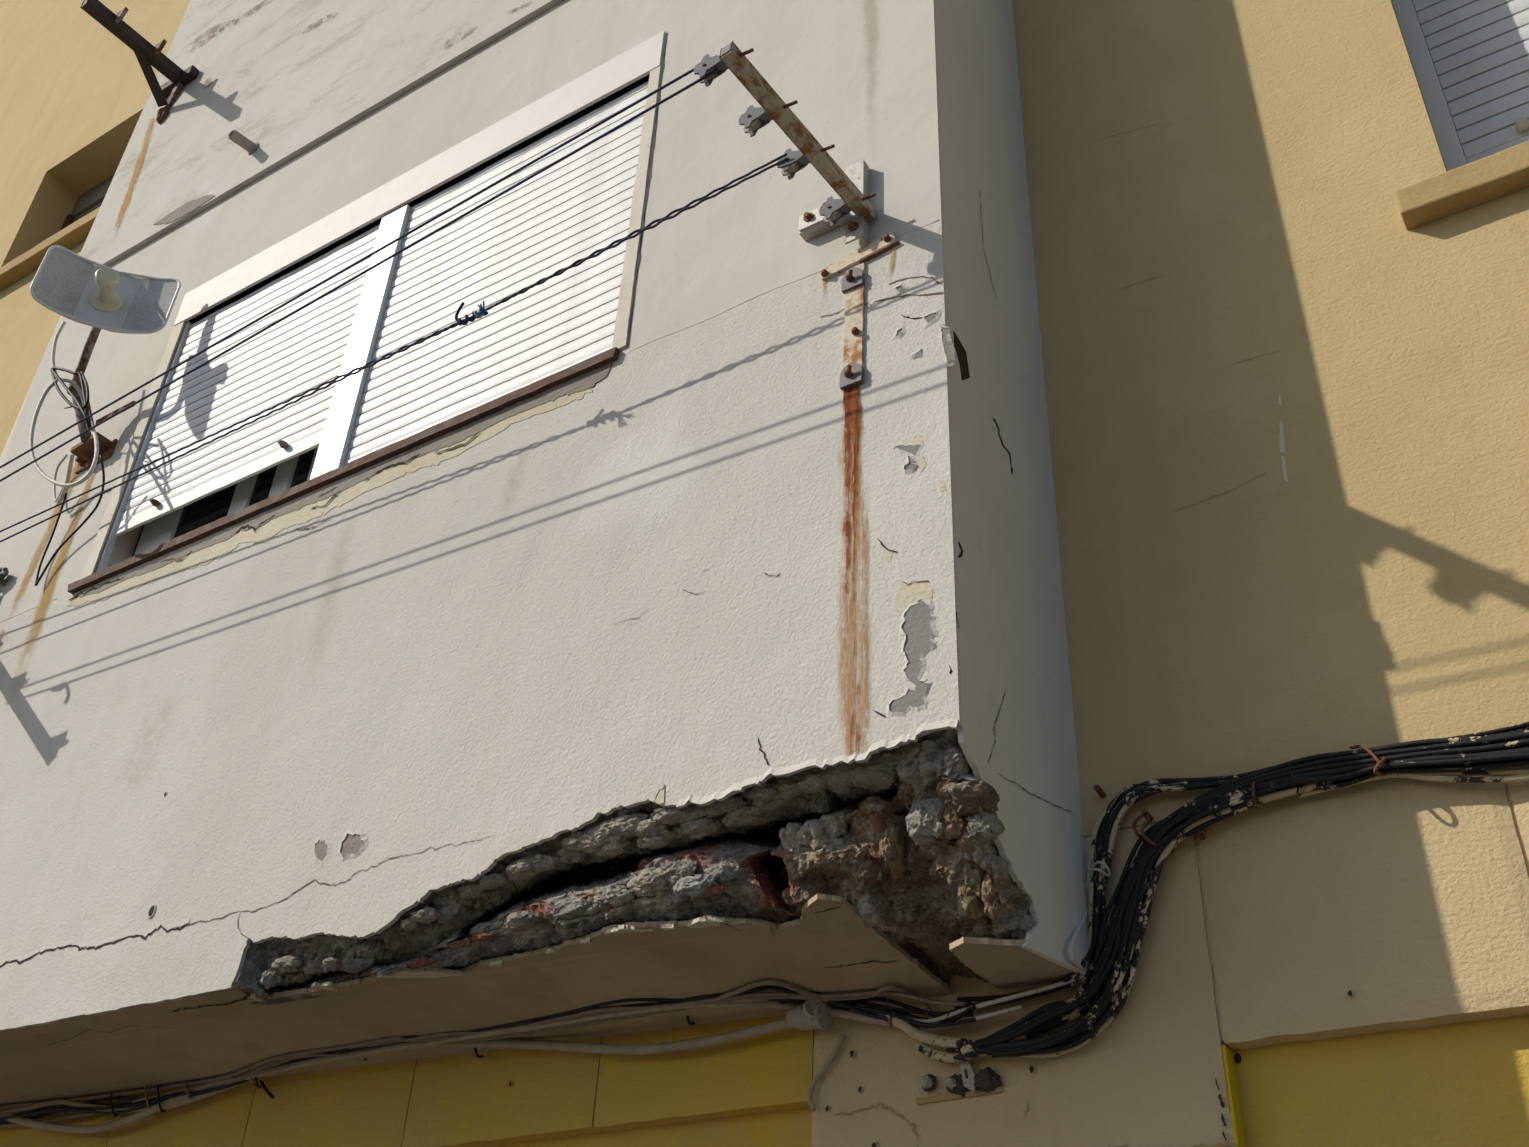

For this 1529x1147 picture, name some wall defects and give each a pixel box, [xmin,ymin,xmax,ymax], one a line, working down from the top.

spalling [891,309,970,381]
corrosion [15,462,96,645]
flaking render [67,362,612,607]
corrosion [839,385,868,754]
crack [0,835,493,967]
spalling [235,579,1036,1005]